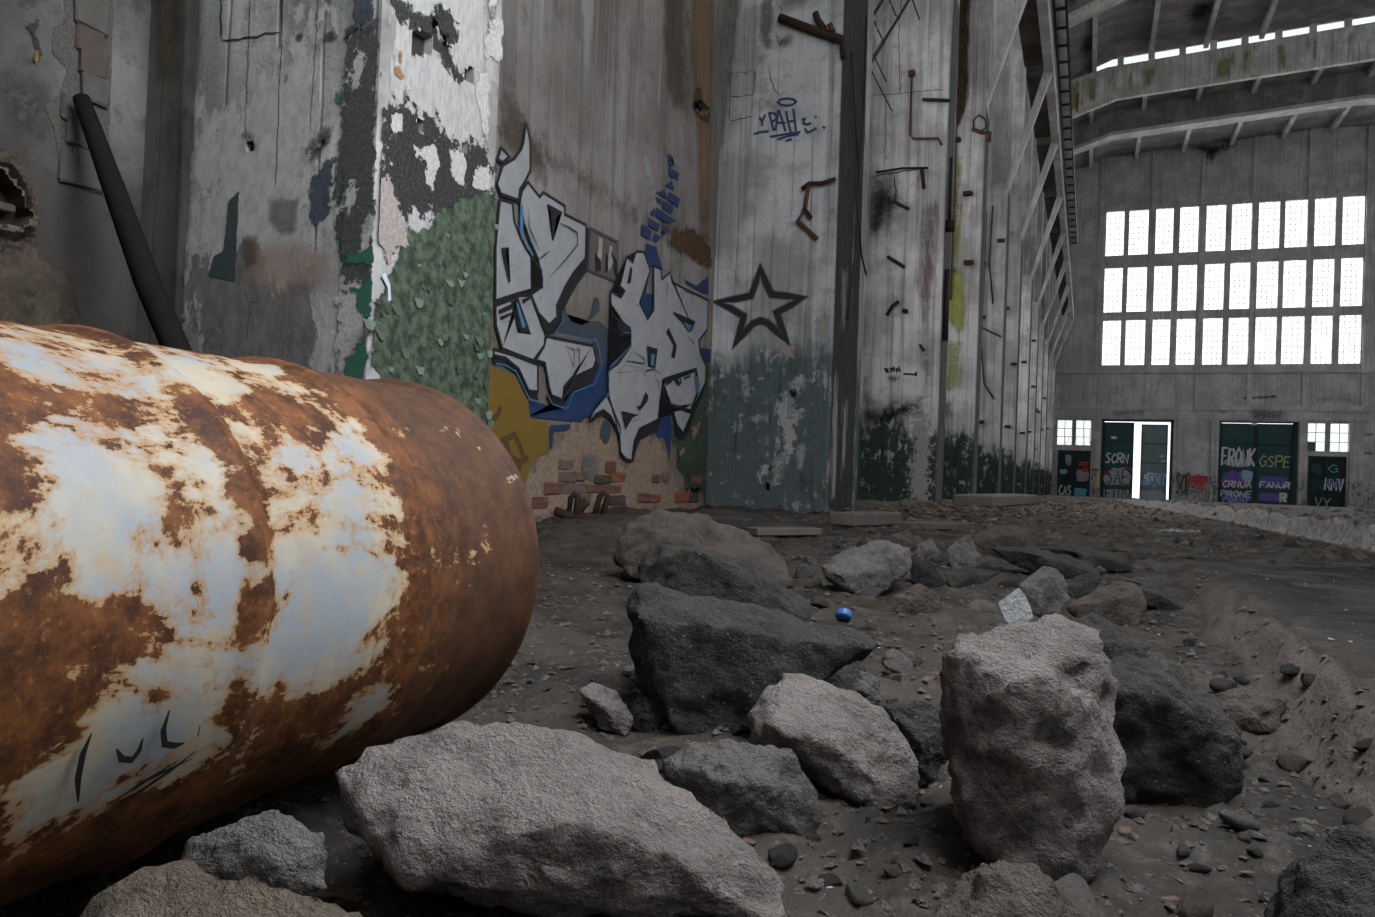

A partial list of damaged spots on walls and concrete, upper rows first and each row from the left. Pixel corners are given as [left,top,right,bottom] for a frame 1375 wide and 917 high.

flaking render [44,0,114,196]
spalling [0,161,43,242]
peeling [182,0,504,428]
spalling [525,362,710,520]